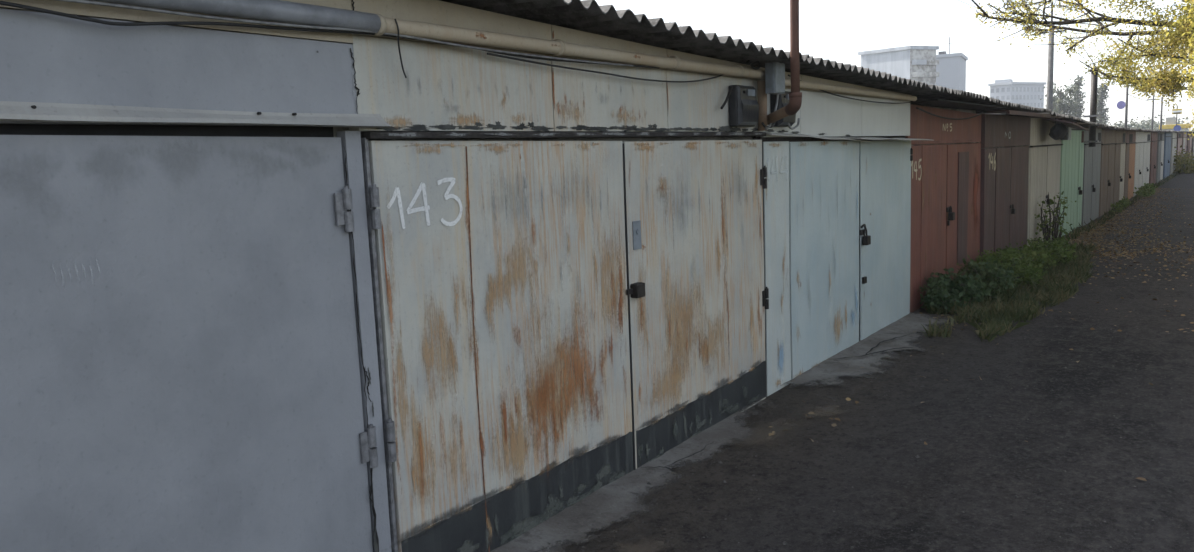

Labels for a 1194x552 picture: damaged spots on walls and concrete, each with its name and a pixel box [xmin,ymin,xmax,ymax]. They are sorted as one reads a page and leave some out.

corrosion [382,225,463,495]
corrosion [480,241,625,472]
corrosion [639,276,729,405]